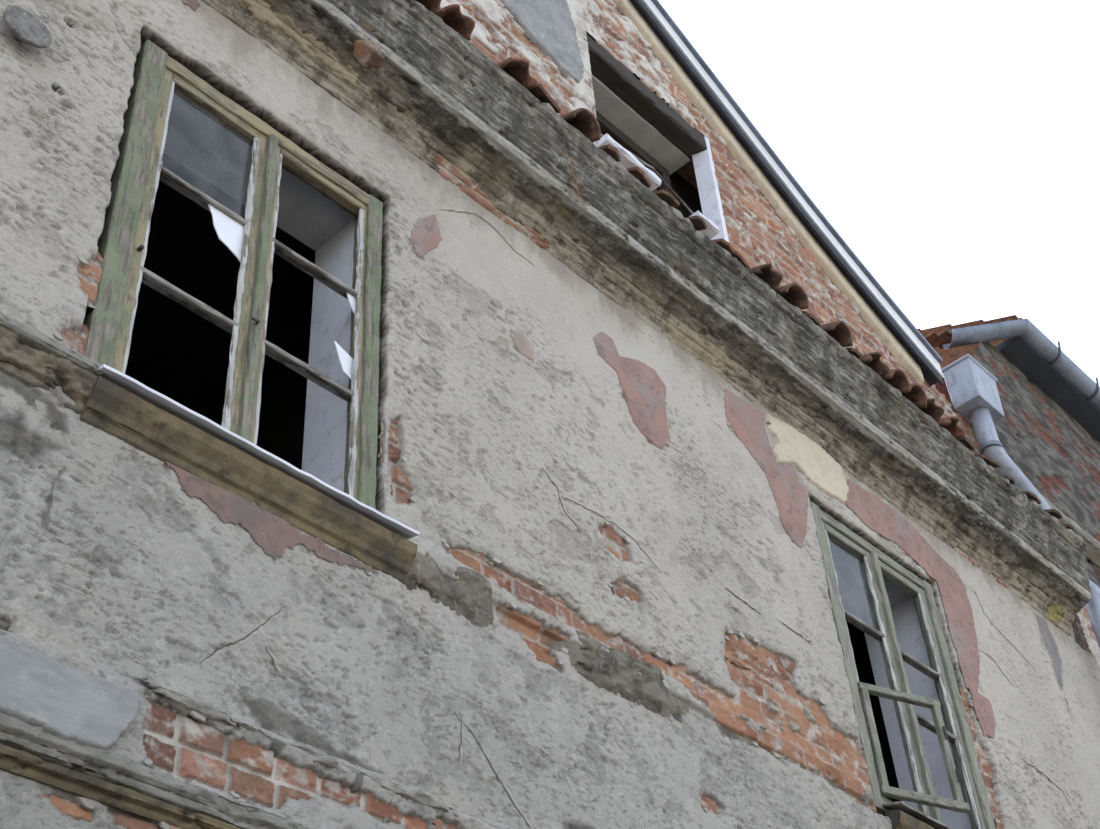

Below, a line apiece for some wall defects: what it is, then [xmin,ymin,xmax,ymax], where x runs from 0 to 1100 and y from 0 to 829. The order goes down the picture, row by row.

peeling [409,214,442,259]
crack [439,207,534,265]
peeling [593,332,671,450]
peeling [165,461,382,576]
peeling [723,388,808,549]
crack [200,609,283,674]
flaking render [441,539,877,814]
peeling [845,479,1007,829]
flaking render [43,794,95,822]
flaking render [108,810,181,829]
flaking render [143,702,459,829]
crack [455,711,534,829]